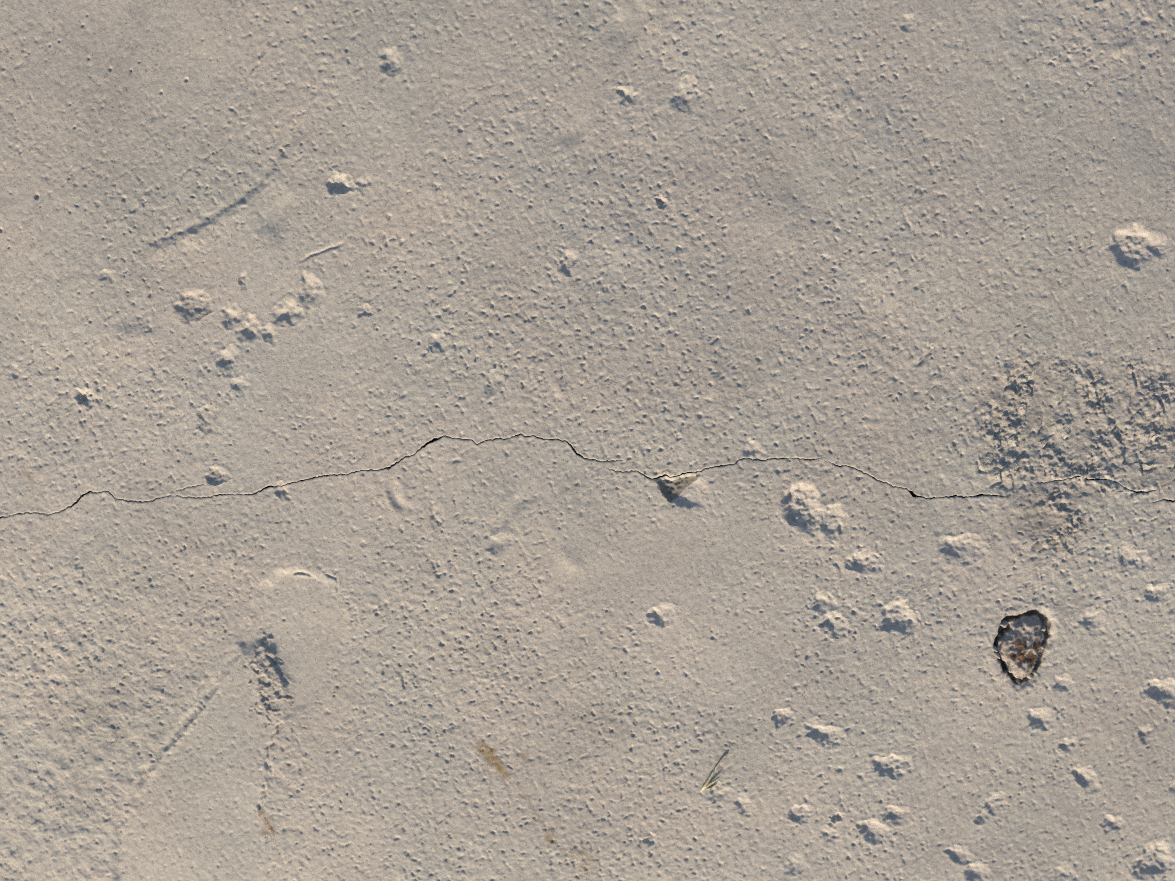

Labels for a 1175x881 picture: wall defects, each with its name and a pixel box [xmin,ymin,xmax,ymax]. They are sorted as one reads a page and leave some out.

crack [0,430,1175,522]
rust [1010,641,1041,672]